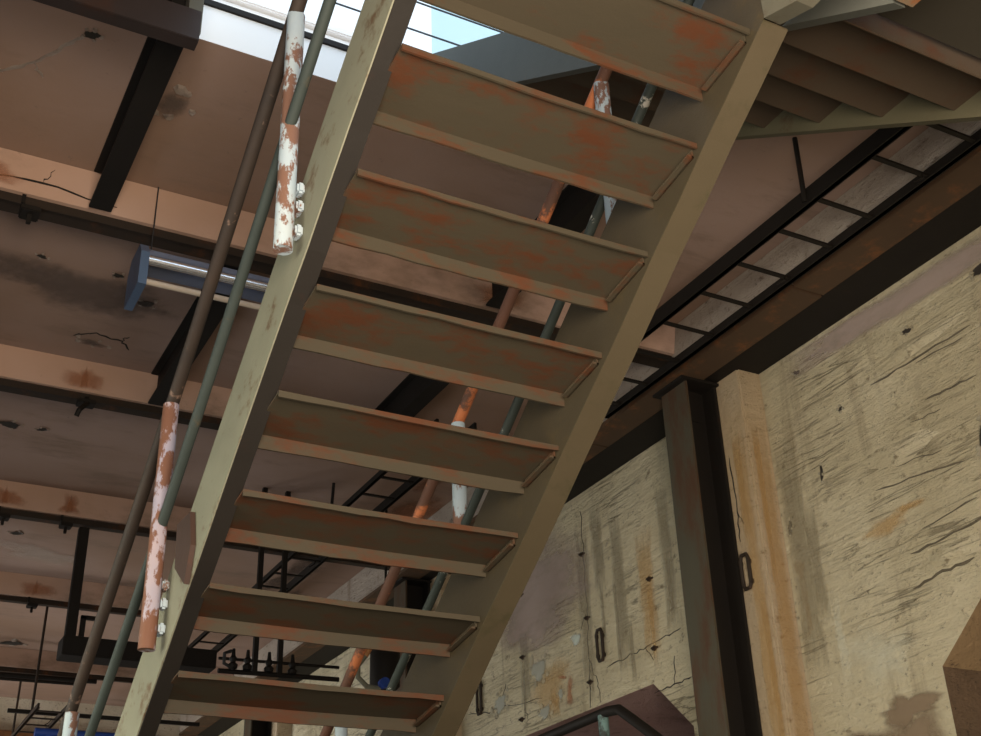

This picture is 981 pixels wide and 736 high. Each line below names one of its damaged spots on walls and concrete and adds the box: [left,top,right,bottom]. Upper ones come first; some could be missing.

crack [73,332,130,350]
water stain [579,529,601,651]